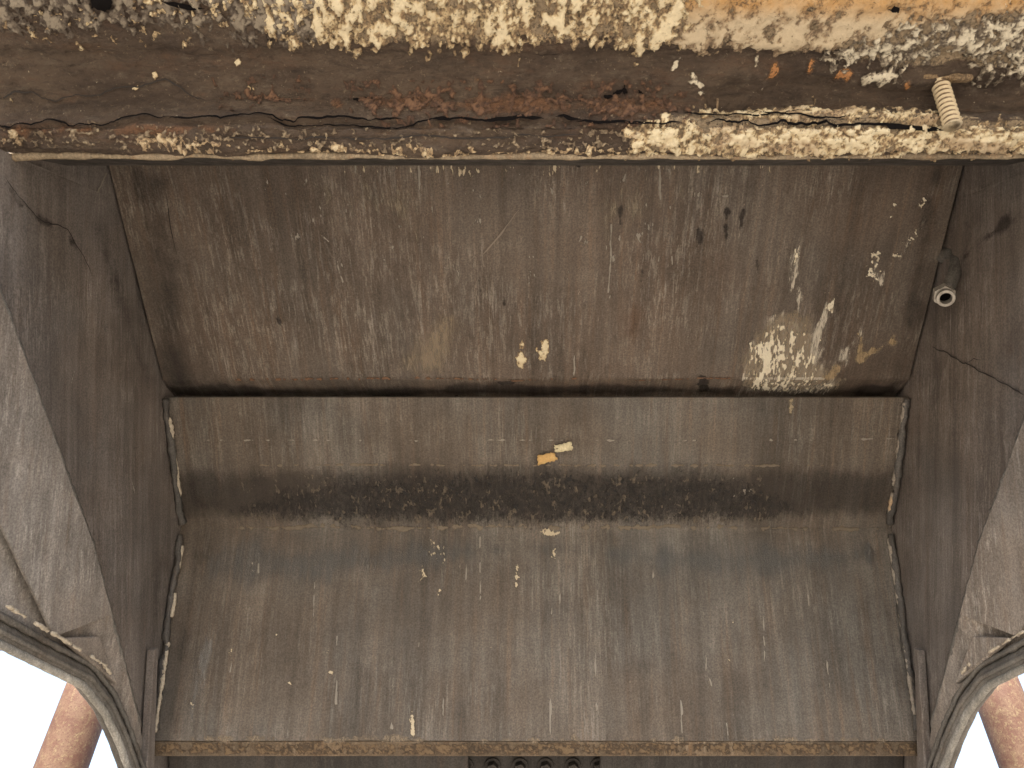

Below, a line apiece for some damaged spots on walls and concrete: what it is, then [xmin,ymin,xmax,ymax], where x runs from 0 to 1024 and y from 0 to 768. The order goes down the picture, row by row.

peeling [0,0,1024,88]
crack [0,78,944,140]
rust [337,80,692,128]
peeling [245,96,1024,162]
crack [5,177,93,277]
peeling [748,314,833,393]
crack [933,347,1024,395]